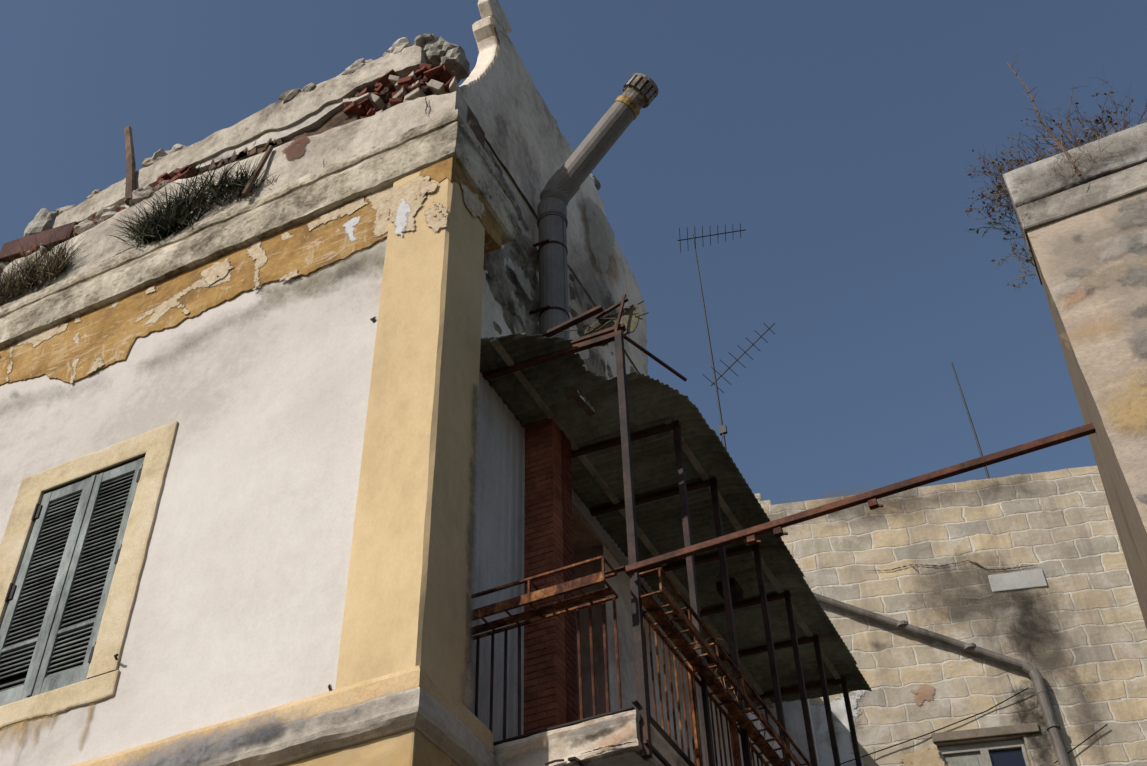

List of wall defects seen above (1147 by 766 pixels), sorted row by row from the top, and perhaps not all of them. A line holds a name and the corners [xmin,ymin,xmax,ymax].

flaking render [194,63,461,176]
peeling [307,174,449,242]
peeling [134,258,234,325]
peeling [246,241,268,290]
peeling [278,269,300,281]
peeling [4,317,81,382]
peeling [69,357,104,387]
crack [867,560,1038,599]
damp [121,714,290,766]
spalling [545,742,652,766]